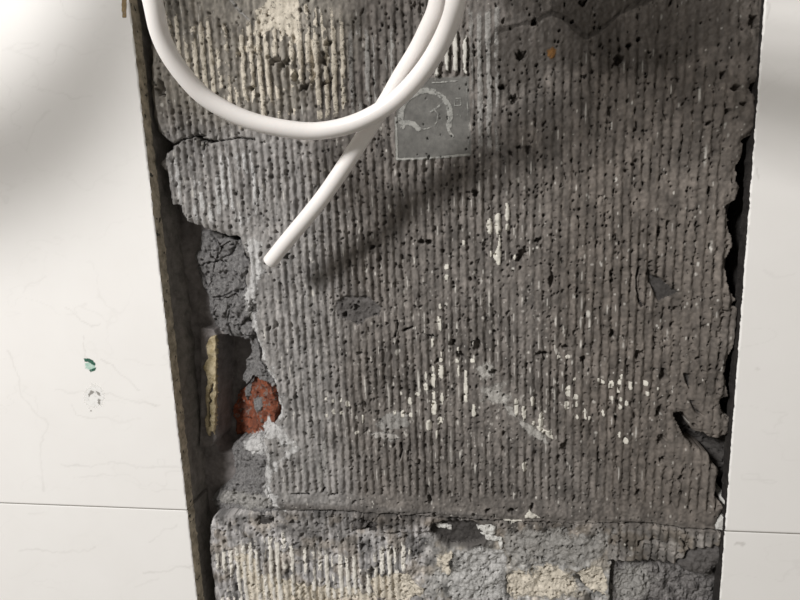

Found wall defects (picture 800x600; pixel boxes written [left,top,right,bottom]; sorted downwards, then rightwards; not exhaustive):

crack [175,135,253,147]
spalling [195,229,282,524]
spalling [673,412,725,530]
spalling [352,518,377,532]
spalling [430,519,504,549]
peeling [504,508,541,523]
spalling [609,558,715,600]